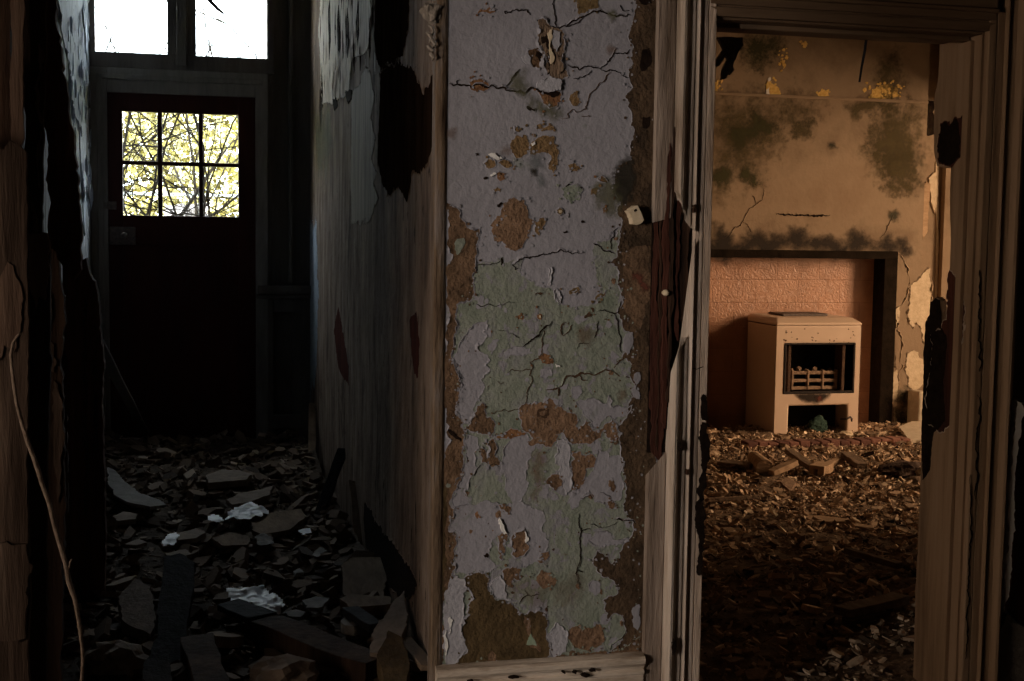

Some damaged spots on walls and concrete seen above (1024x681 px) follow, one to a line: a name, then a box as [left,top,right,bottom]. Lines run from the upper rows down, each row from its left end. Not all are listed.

crack [504,0,631,29]
peeling [318,0,433,226]
crack [449,69,545,94]
crack [560,47,630,120]
mould [713,93,814,192]
peeling [863,80,905,99]
mould [846,54,923,191]
crack [729,190,830,236]
crack [476,301,629,414]
peeling [442,0,692,665]
peeling [892,252,933,423]
crack [575,492,636,588]